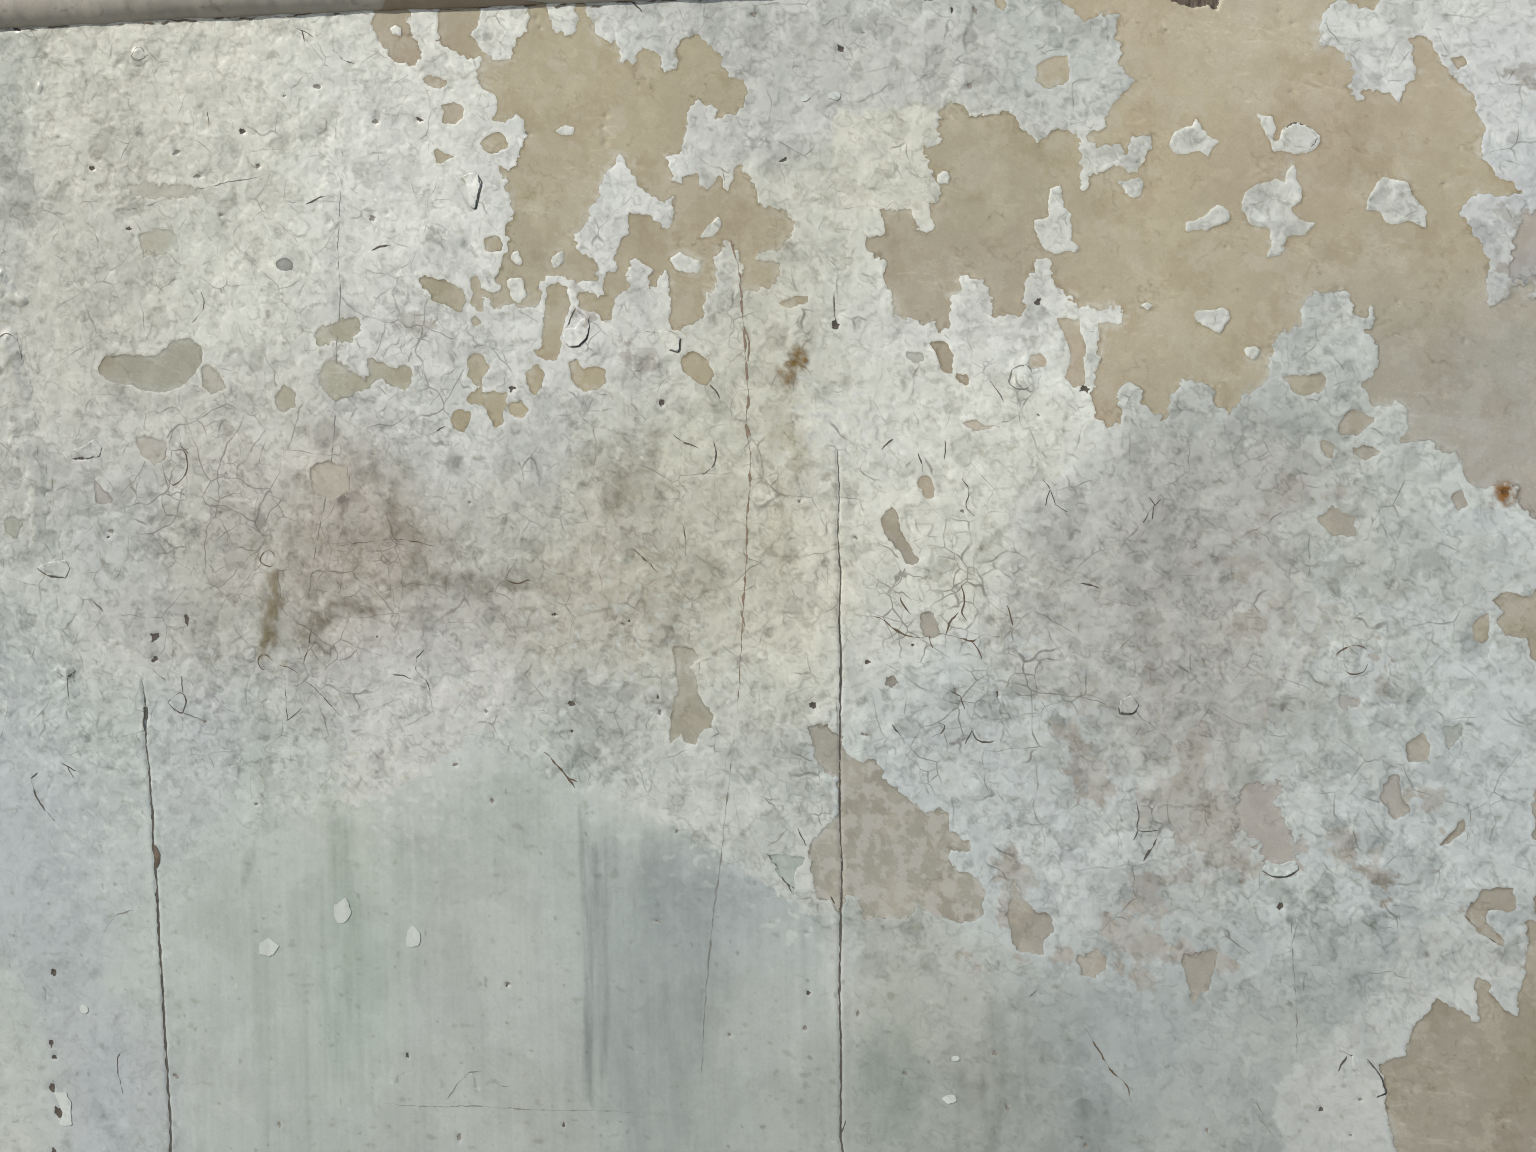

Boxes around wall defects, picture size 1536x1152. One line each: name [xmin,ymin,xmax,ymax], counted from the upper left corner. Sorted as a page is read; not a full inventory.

peeling [98,338,225,394]
peeling [371,0,808,432]
peeling [865,0,1536,519]
peeling [881,507,919,565]
crack [882,439,973,515]
peeling [1472,589,1536,661]
crack [101,668,205,1152]
peeling [769,702,986,923]
crack [768,451,1013,1152]
peeling [1005,879,1054,955]
peeling [1234,779,1313,878]
peeling [1352,887,1536,1152]